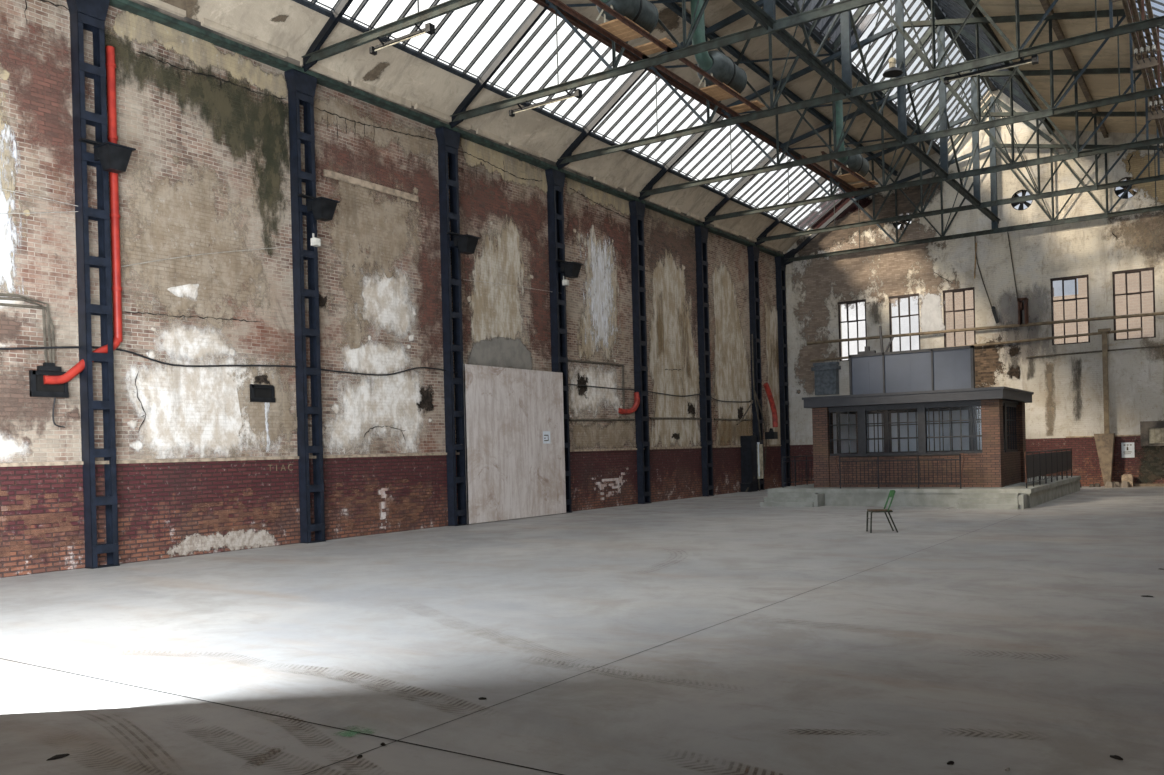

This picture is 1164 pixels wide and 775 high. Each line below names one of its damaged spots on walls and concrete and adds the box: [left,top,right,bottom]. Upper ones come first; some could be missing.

crack [24,0,69,23]
flaking render [0,17,91,460]
leakage [105,30,290,256]
flaking render [110,147,297,459]
flaking render [314,96,443,454]
flaking render [458,137,551,360]
flaking render [565,178,752,449]
flaking render [763,299,781,445]
flaking render [792,182,960,395]
leakage [1143,338,1164,359]
spalling [160,528,275,558]
spalling [592,468,628,500]